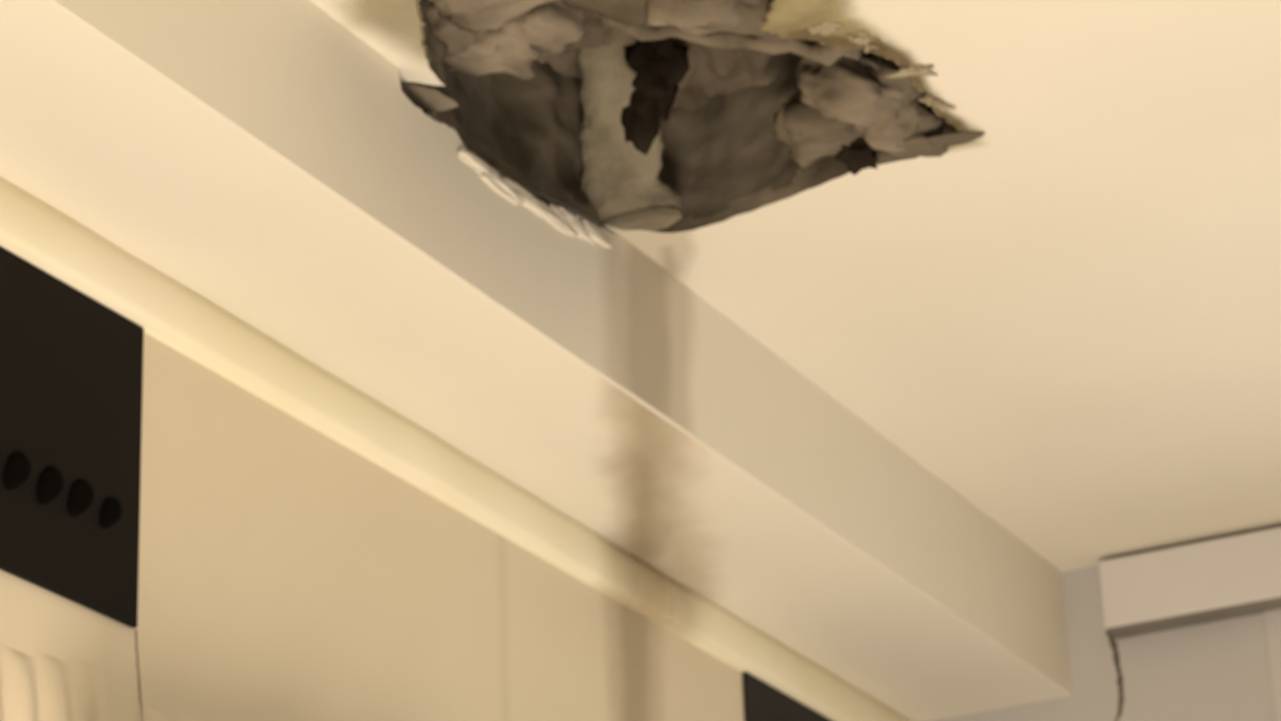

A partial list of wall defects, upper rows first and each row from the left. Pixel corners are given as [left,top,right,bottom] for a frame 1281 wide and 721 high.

peeling [400,82,459,113]
spalling [760,0,985,149]
damp [624,555,670,625]
crack [135,630,143,721]
crack [1106,630,1125,721]